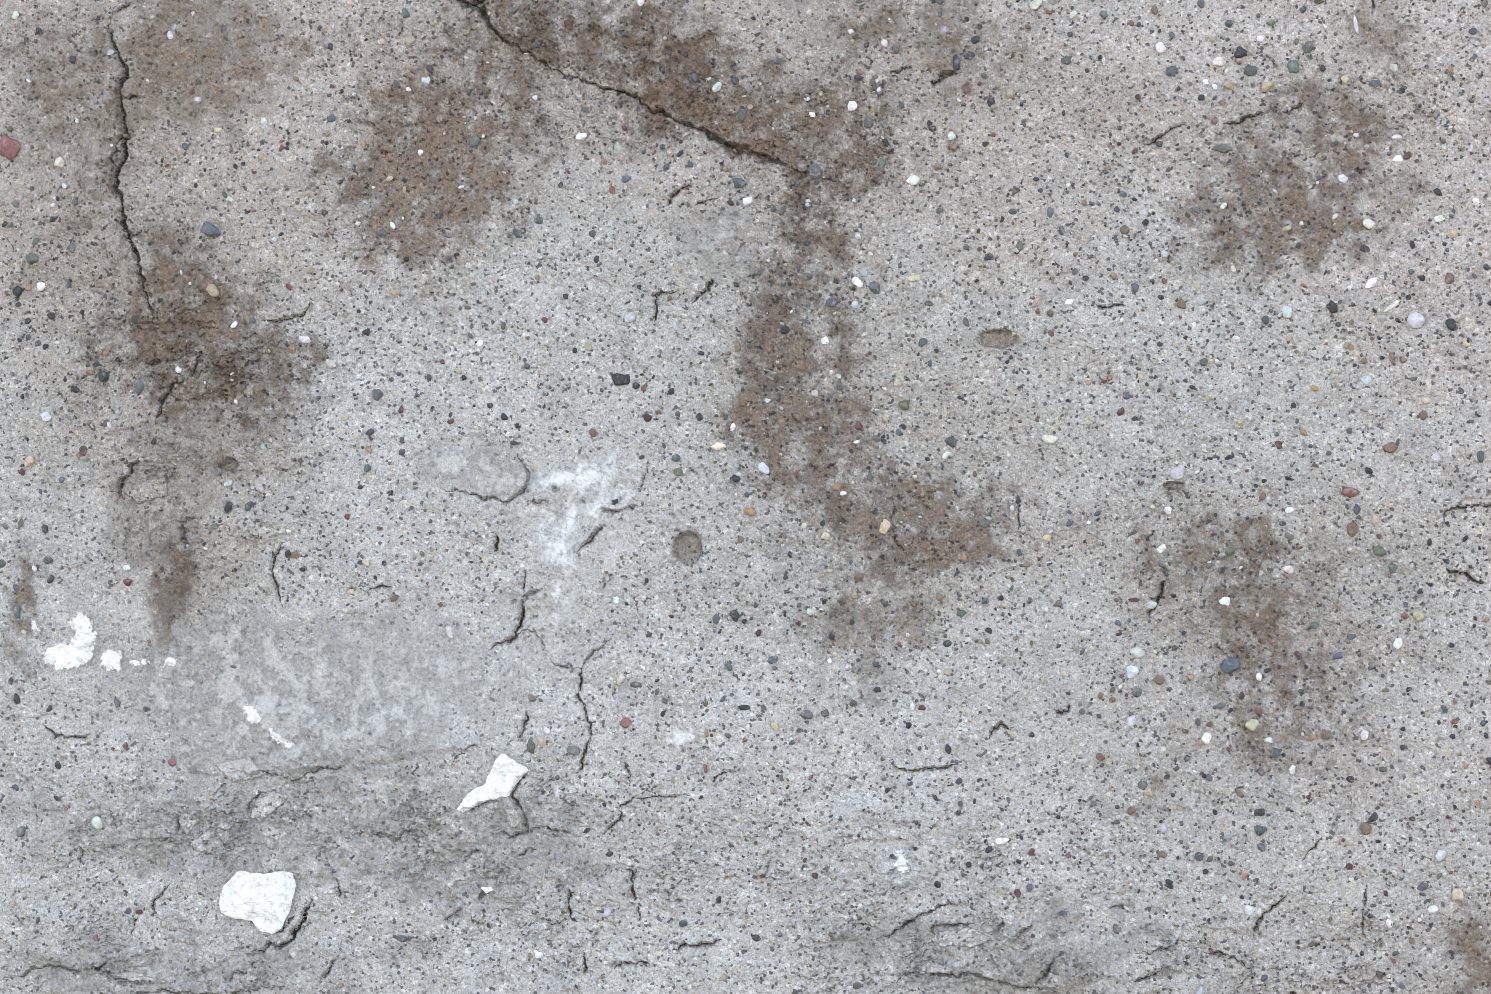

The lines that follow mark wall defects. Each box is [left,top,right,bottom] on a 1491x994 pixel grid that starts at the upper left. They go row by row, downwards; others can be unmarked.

crack [108,1,202,422]
water stain [1171,77,1390,274]
water stain [126,226,328,435]
water stain [314,0,1010,684]
crack [118,456,147,500]
crack [444,454,728,857]
crack [250,883,341,952]
crack [625,869,640,920]
crack [567,889,721,971]